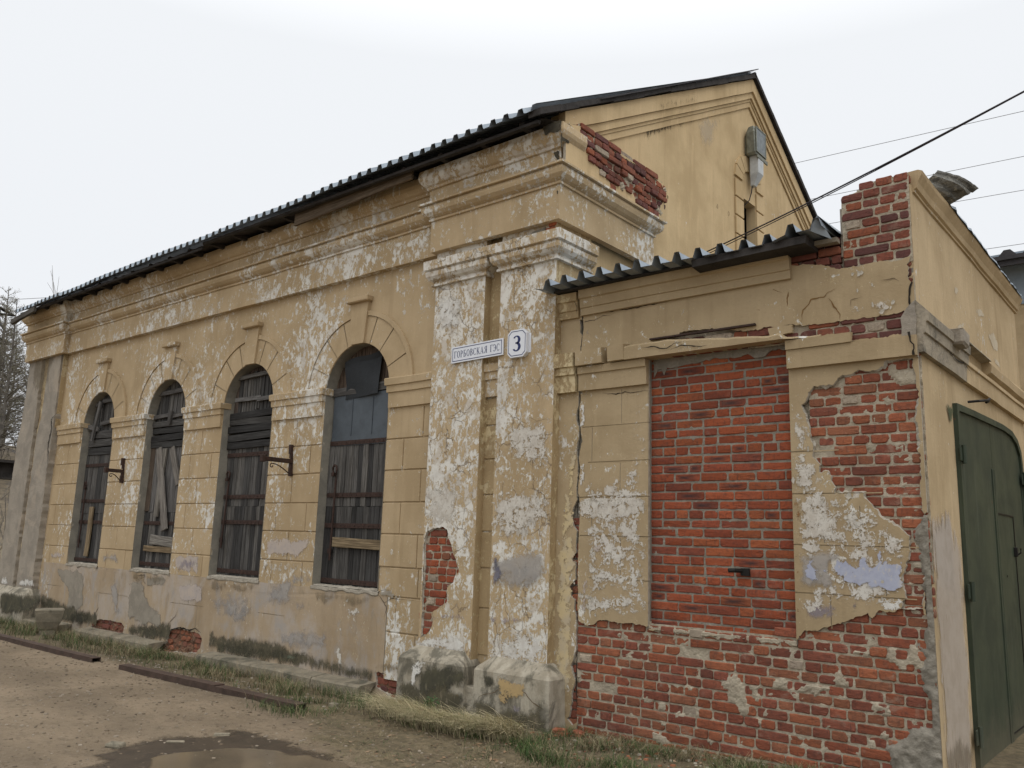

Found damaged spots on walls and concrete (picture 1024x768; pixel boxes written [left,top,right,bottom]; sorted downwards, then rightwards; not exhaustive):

flaking render [577,123,667,217]
flaking render [791,172,913,287]
crack [773,289,857,322]
flaking render [91,619,124,633]
flaking render [161,629,202,654]
flaking render [417,527,467,652]
crack [569,394,582,725]
flaking render [489,353,943,768]